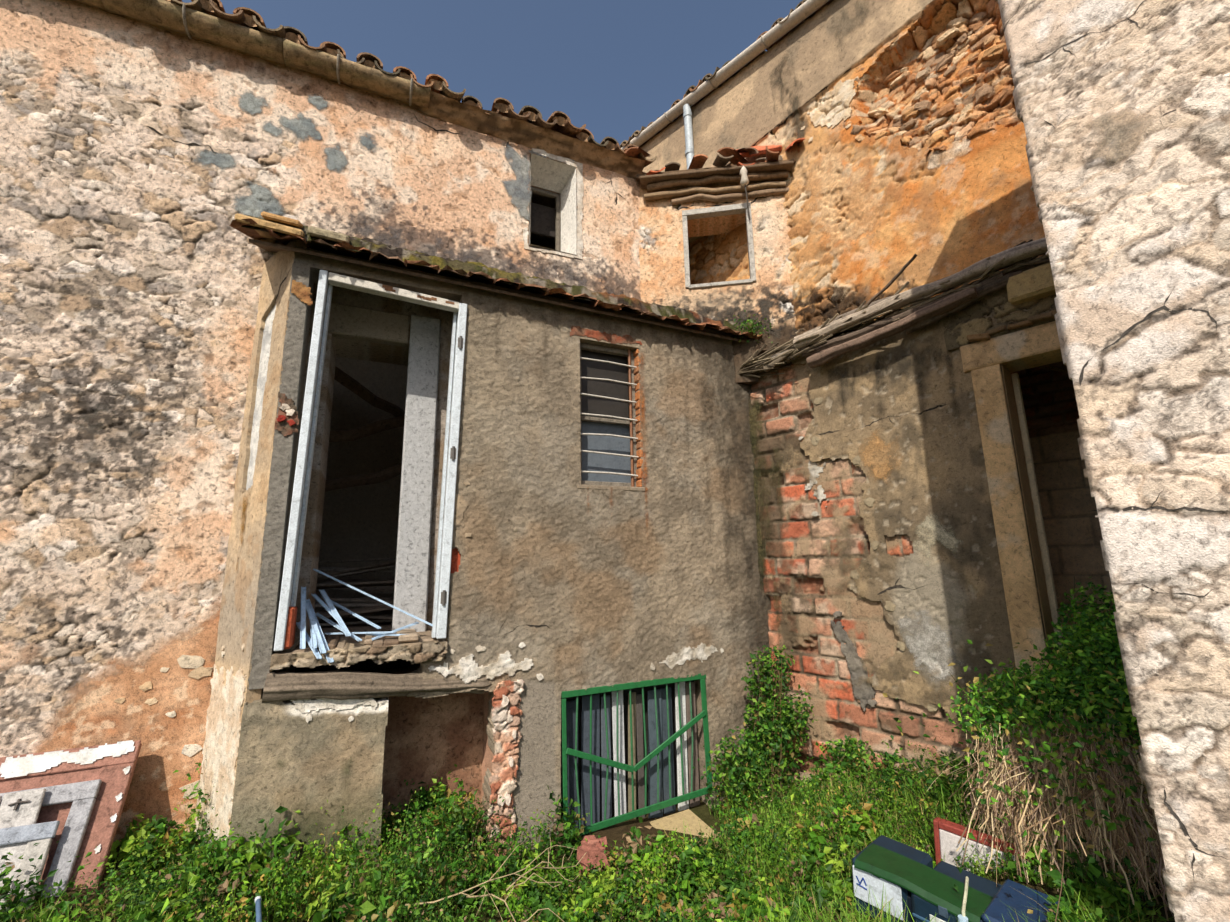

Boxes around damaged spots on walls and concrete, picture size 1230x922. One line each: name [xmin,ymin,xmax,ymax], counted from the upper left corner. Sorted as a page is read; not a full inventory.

spalling [801,0,1022,169]
peeling [808,150,888,257]
crack [1079,293,1219,386]
crack [1088,489,1224,512]
flaking render [750,362,992,789]
peeling [650,643,724,670]
spalling [428,642,544,857]